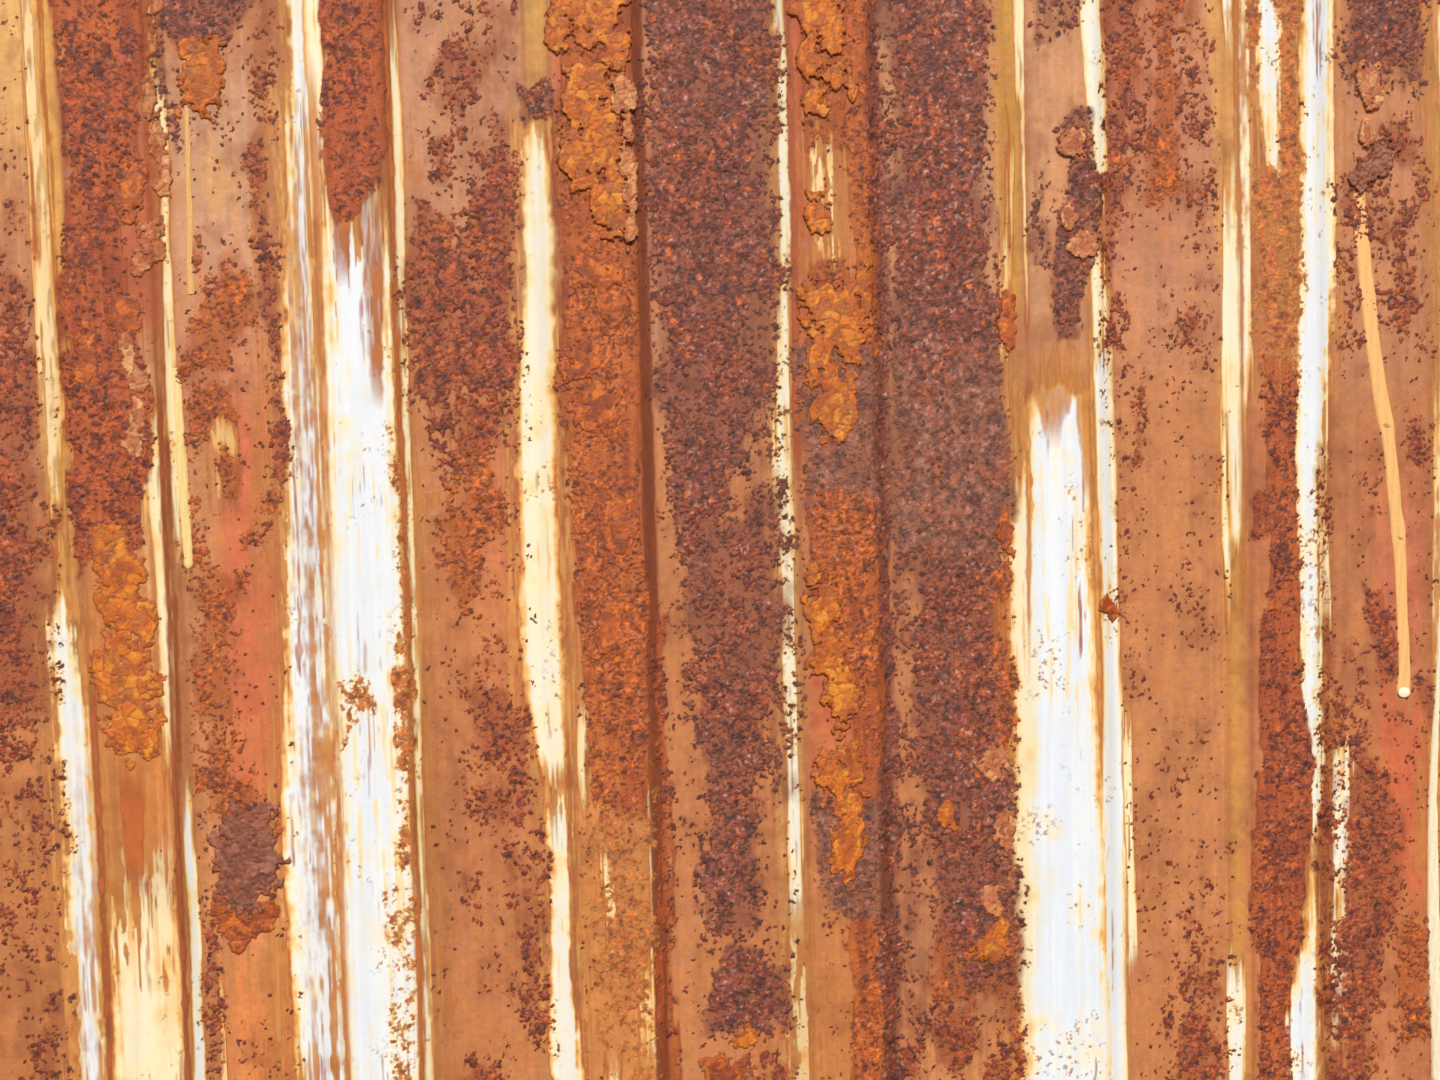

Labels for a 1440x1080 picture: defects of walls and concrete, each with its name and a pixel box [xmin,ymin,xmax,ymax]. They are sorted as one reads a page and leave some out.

corrosion [0,0,331,1080]
corrosion [305,0,1440,1080]